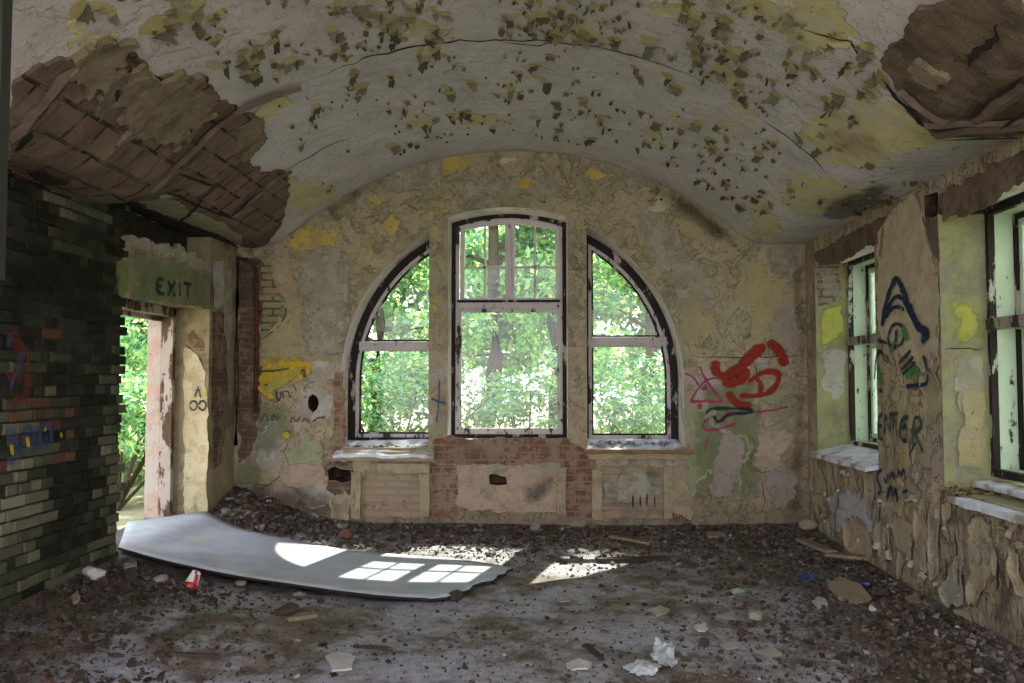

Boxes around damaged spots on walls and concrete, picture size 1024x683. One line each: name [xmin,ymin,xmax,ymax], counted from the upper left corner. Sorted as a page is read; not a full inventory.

crack [302,39,717,90]
flaking render [139,0,1024,426]
crack [760,118,824,171]
flaking render [256,175,689,523]
flaking render [952,354,986,469]
flaking render [812,442,1024,631]